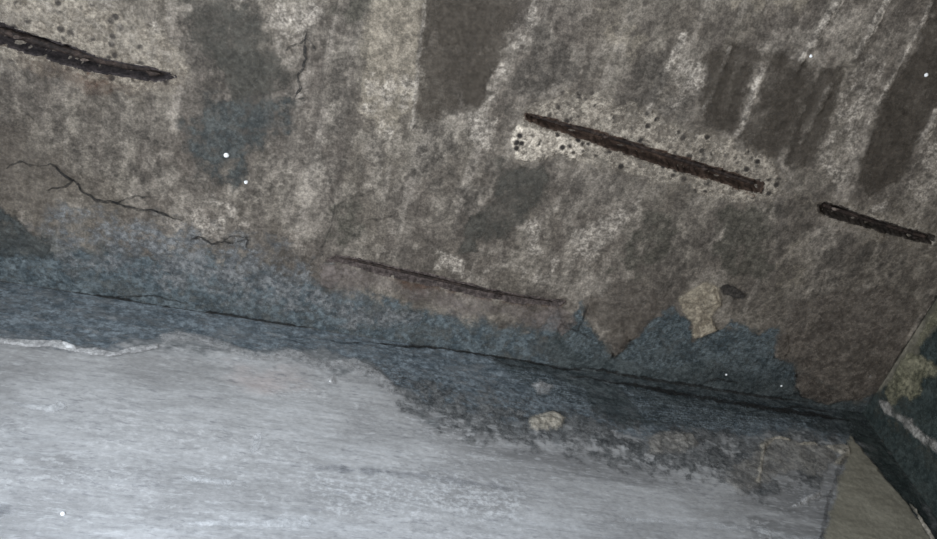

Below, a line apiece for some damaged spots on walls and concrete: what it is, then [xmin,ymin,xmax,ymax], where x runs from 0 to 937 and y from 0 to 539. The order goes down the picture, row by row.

leakage [180,1,294,187]
leakage [414,0,518,122]
leakage [701,44,843,169]
leakage [858,0,937,196]
crack [6,161,248,247]
leakage [458,158,549,254]
spalling [341,257,553,302]
spalling [679,282,746,338]
flaking render [0,333,393,389]
leakage [0,204,937,539]
flaking render [529,411,565,430]
flaking render [728,436,851,489]